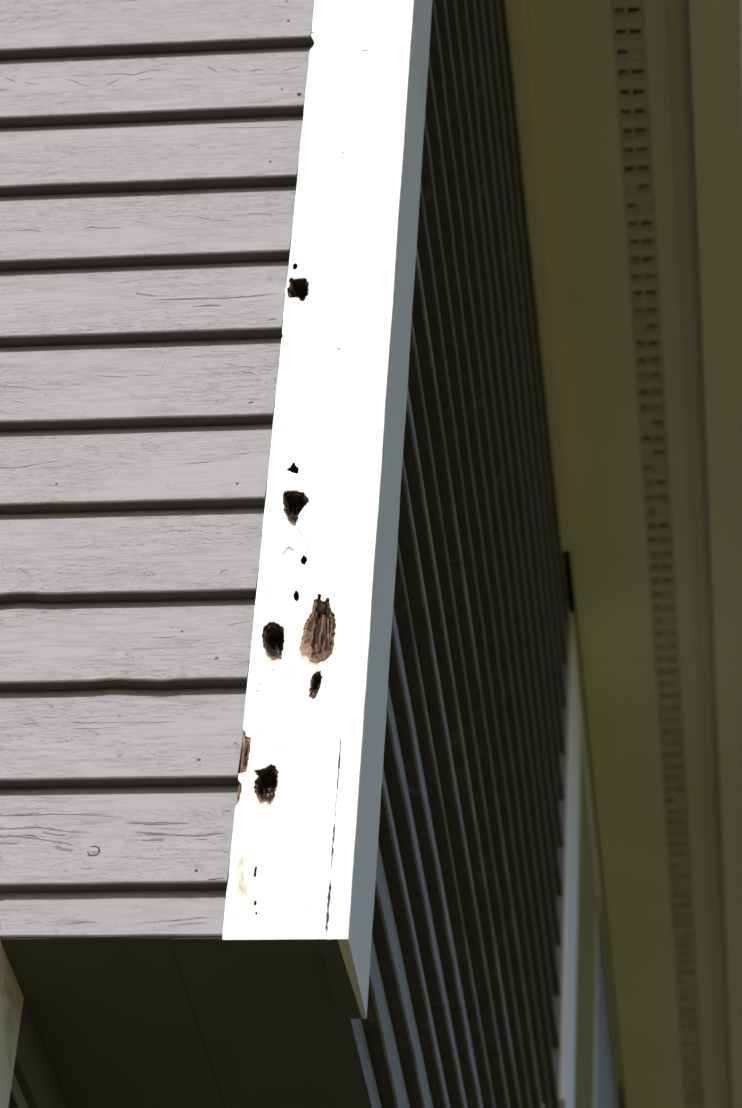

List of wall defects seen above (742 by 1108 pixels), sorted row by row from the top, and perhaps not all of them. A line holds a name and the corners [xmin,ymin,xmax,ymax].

peeling [285,277,311,303]
peeling [281,489,310,527]
peeling [250,593,338,701]
peeling [252,762,281,806]
crack [325,737,342,934]